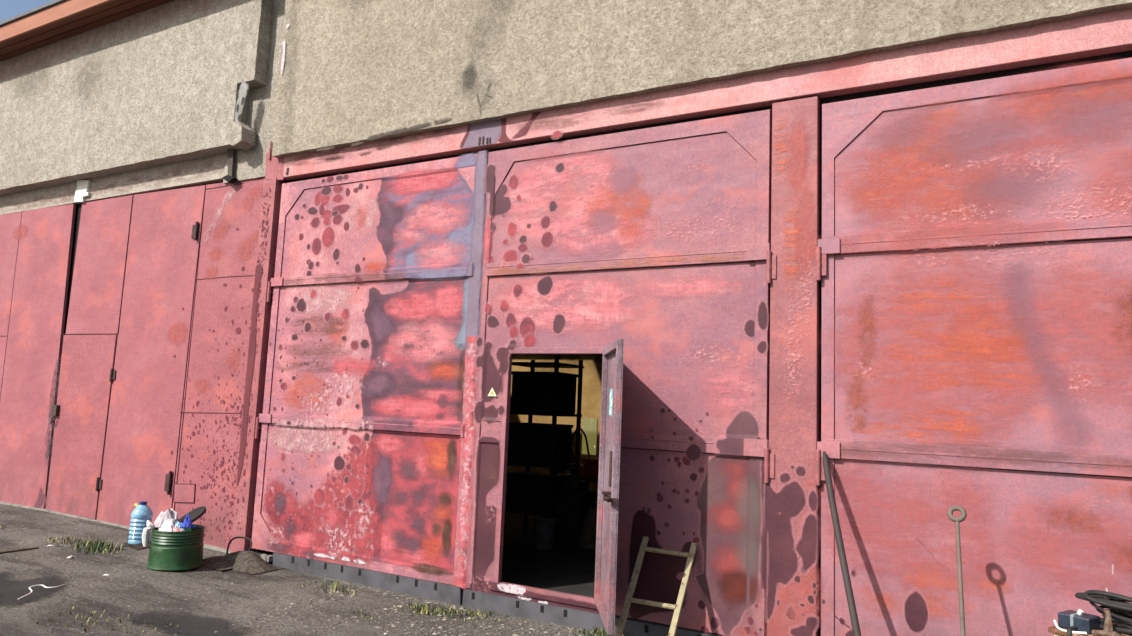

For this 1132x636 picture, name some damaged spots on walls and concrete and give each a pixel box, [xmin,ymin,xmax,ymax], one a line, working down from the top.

leakage [464,66,475,86]
peeling [314,503,373,564]